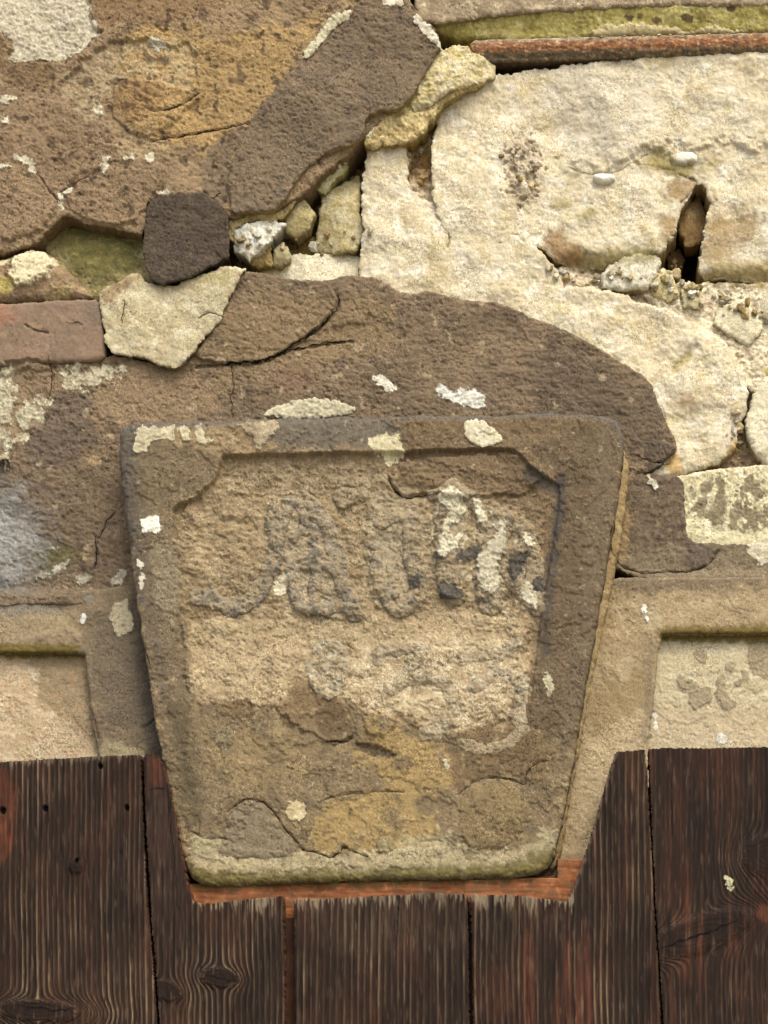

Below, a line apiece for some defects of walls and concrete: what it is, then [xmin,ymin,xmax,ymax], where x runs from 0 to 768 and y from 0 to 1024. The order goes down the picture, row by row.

crack [196,289,353,415]
crack [317,790,403,803]
crack [227,798,368,858]